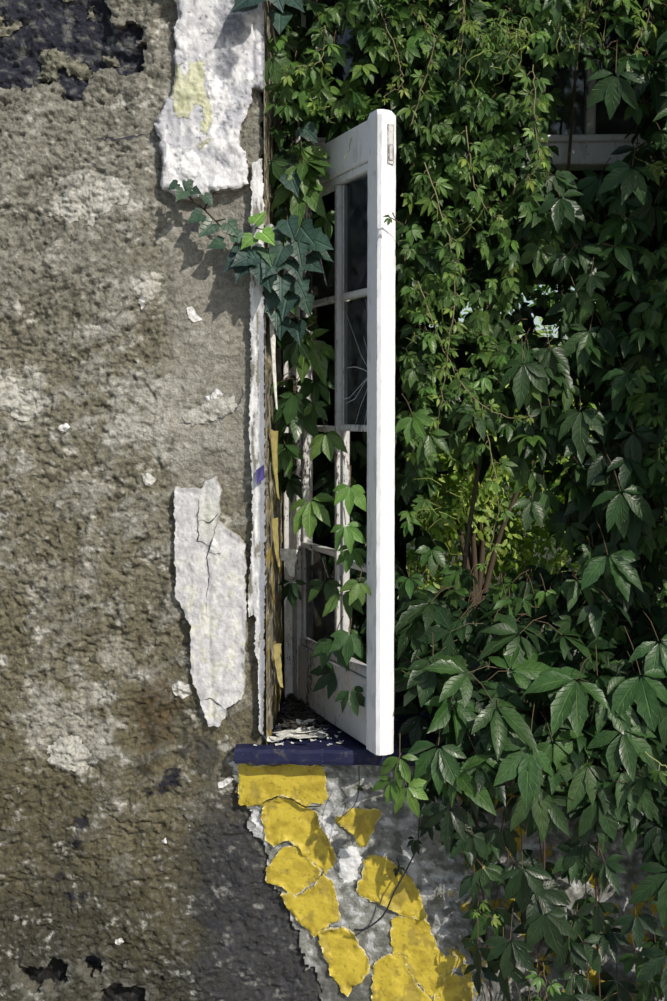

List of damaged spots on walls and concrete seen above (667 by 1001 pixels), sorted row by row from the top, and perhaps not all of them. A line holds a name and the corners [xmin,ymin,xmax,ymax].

spalling [0,0,147,101]
crack [196,493,218,612]
peeling [172,476,248,727]
peeling [218,763,474,1001]
spalling [25,957,68,984]
spalling [86,955,103,972]
spalling [100,983,146,1001]